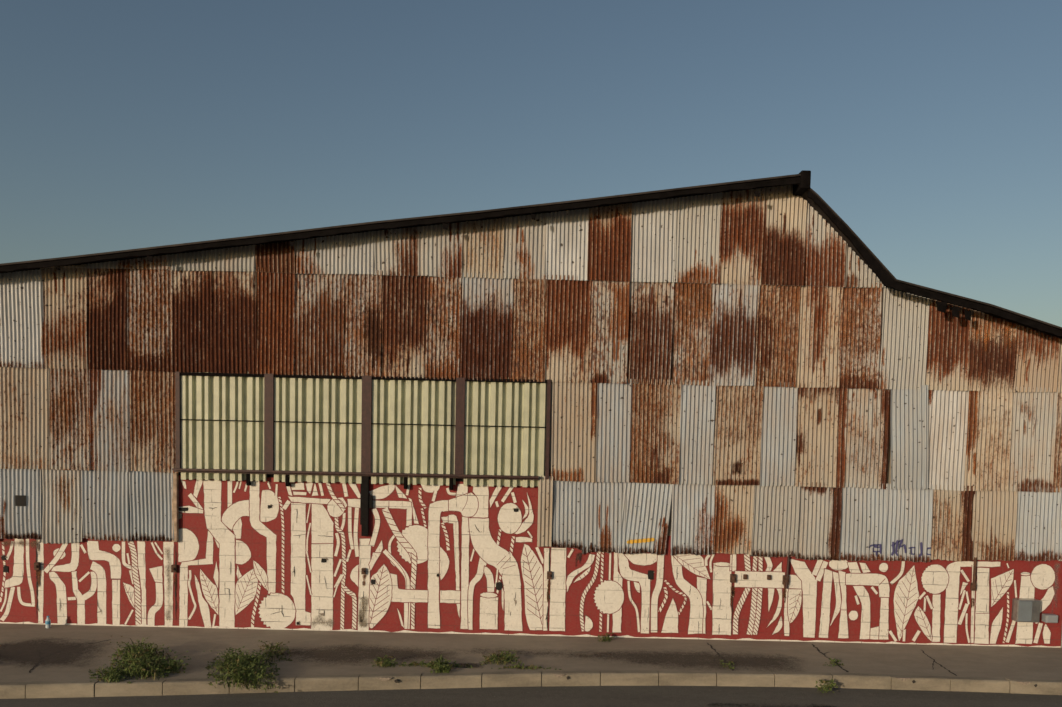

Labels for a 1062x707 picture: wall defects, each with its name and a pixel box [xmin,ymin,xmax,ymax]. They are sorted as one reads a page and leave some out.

rust [0,189,1062,562]